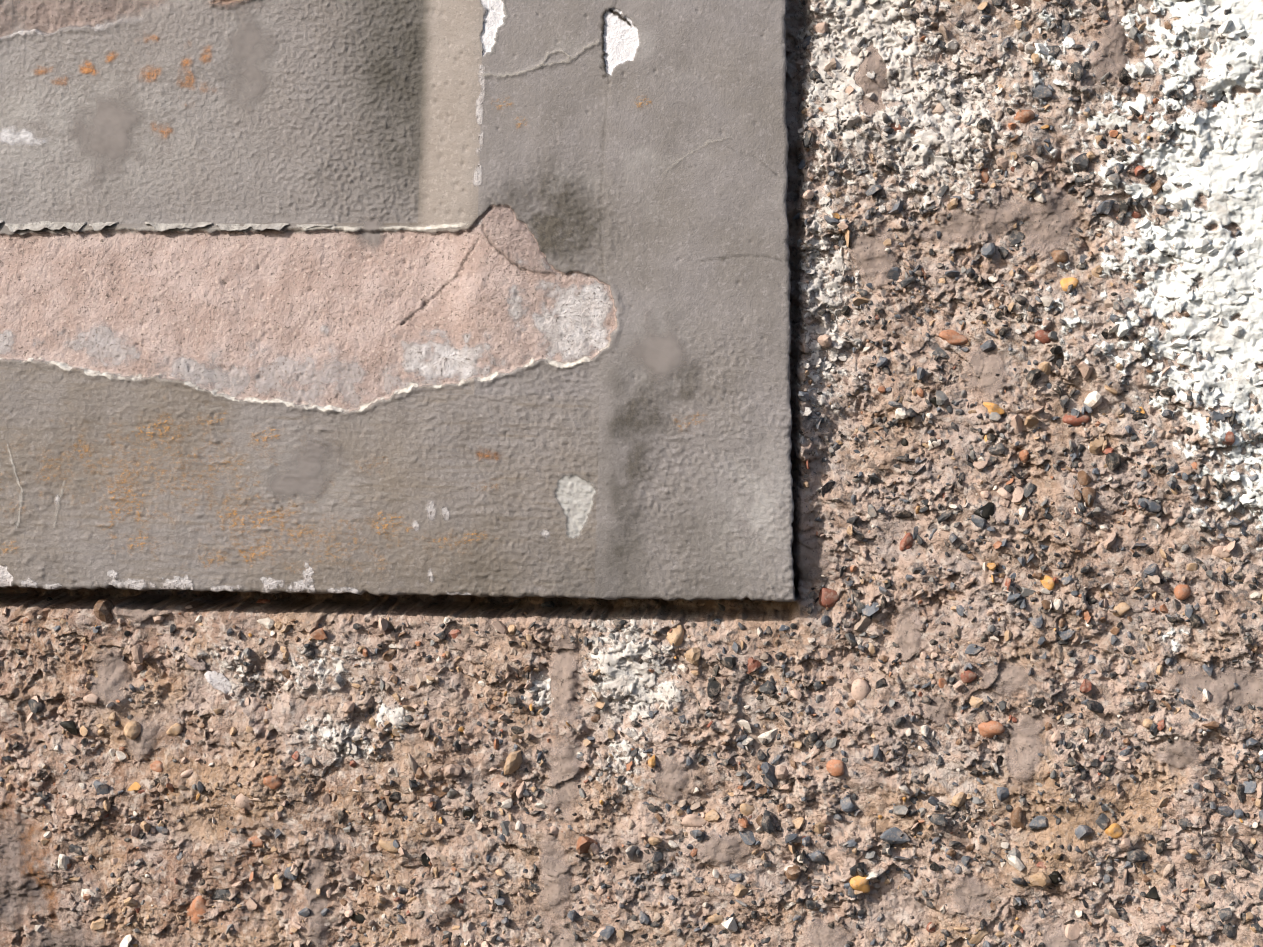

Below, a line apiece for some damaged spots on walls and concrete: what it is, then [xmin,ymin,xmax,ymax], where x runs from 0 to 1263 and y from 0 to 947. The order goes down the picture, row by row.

spalling [0,0,161,37]
crack [483,40,599,77]
peeling [601,8,639,77]
peeling [473,0,505,186]
peeling [0,205,617,412]
peeling [555,475,596,538]
peeling [0,565,62,589]
peeling [107,570,193,590]
peeling [260,562,358,593]